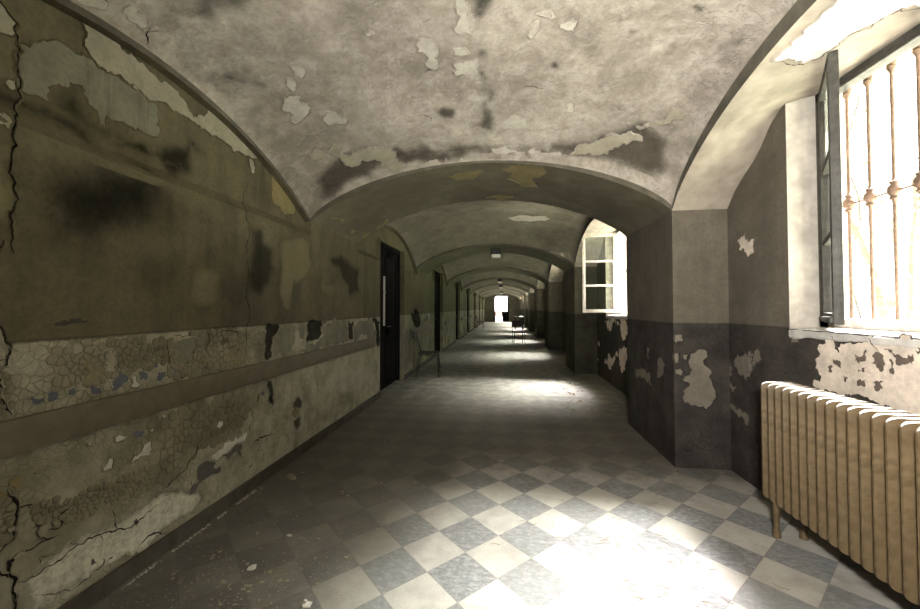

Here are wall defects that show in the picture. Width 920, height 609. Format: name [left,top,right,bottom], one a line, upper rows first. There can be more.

crack [0,0,24,255]
peeling [0,0,258,175]
peeling [269,173,296,216]
peeling [327,143,406,173]
peeling [452,47,480,76]
peeling [770,0,920,64]
crack [0,184,295,609]
peeling [258,316,377,358]
peeling [597,315,717,410]
peeling [729,348,763,426]
peeling [812,332,920,415]
peeling [188,411,254,496]